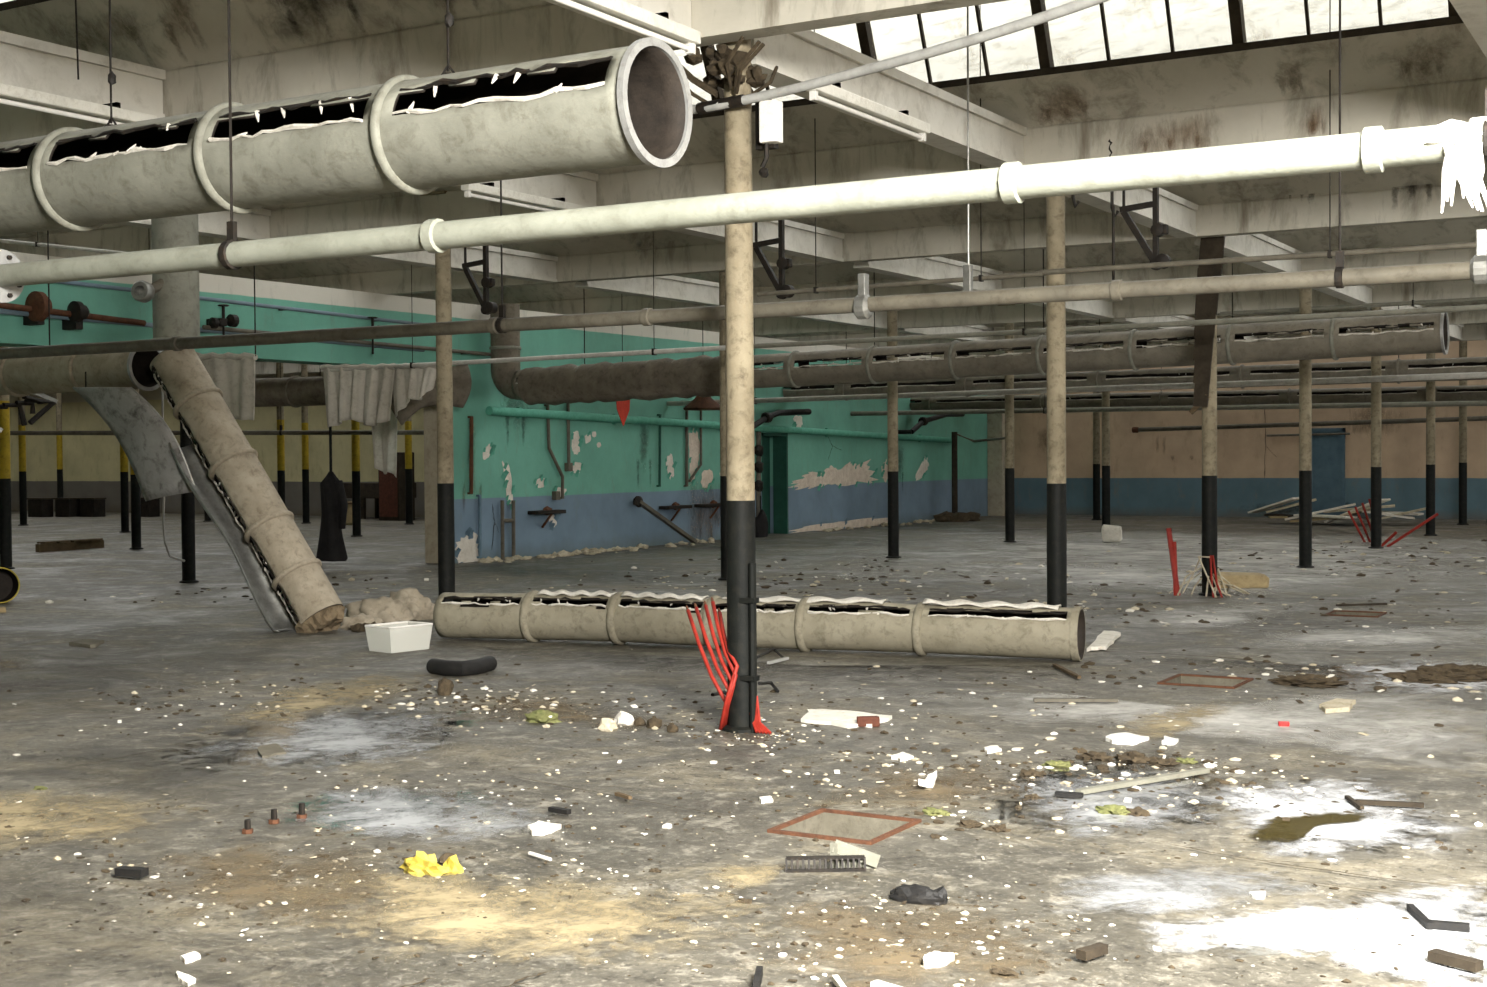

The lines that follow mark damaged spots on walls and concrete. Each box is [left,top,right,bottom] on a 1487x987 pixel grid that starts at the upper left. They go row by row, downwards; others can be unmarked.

peeling [483,442,516,510]
peeling [533,431,601,531]
peeling [788,459,888,491]